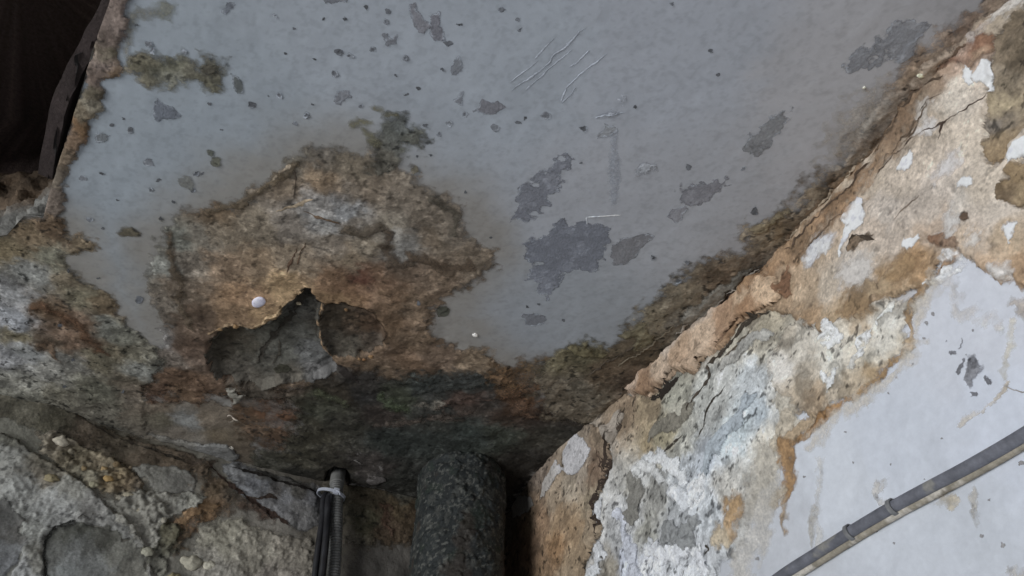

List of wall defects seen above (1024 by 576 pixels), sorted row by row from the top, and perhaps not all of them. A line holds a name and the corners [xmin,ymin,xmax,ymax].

flaking render [0,429,207,576]
damp [0,0,506,472]
spalling [191,517,315,576]
spalling [204,288,387,423]
damp [228,0,1009,518]
flaking render [504,0,1024,576]
rust [770,232,958,534]
crack [874,92,989,179]